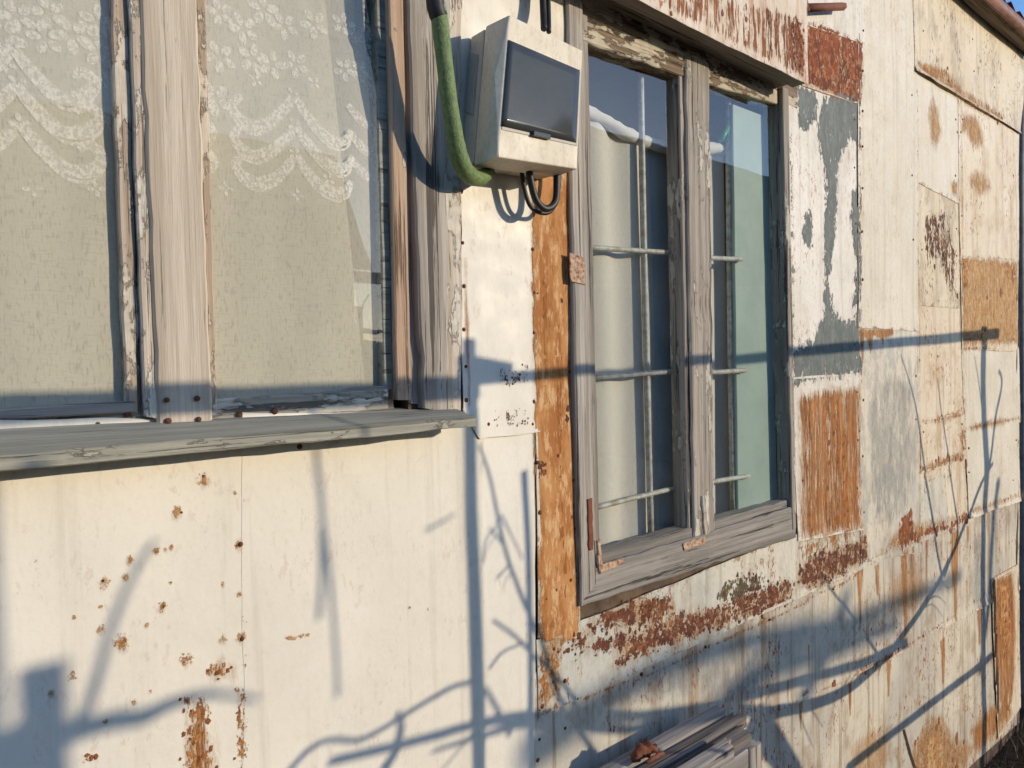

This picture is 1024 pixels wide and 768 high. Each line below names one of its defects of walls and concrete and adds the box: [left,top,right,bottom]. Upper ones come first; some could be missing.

corrosion [662,0,863,104]
peeling [789,85,863,387]
corrosion [918,213,1018,351]
corrosion [798,377,863,542]
corrosion [179,697,218,768]
corrosion [206,663,246,680]
corrosion [233,687,249,768]
corrosion [569,509,1015,768]